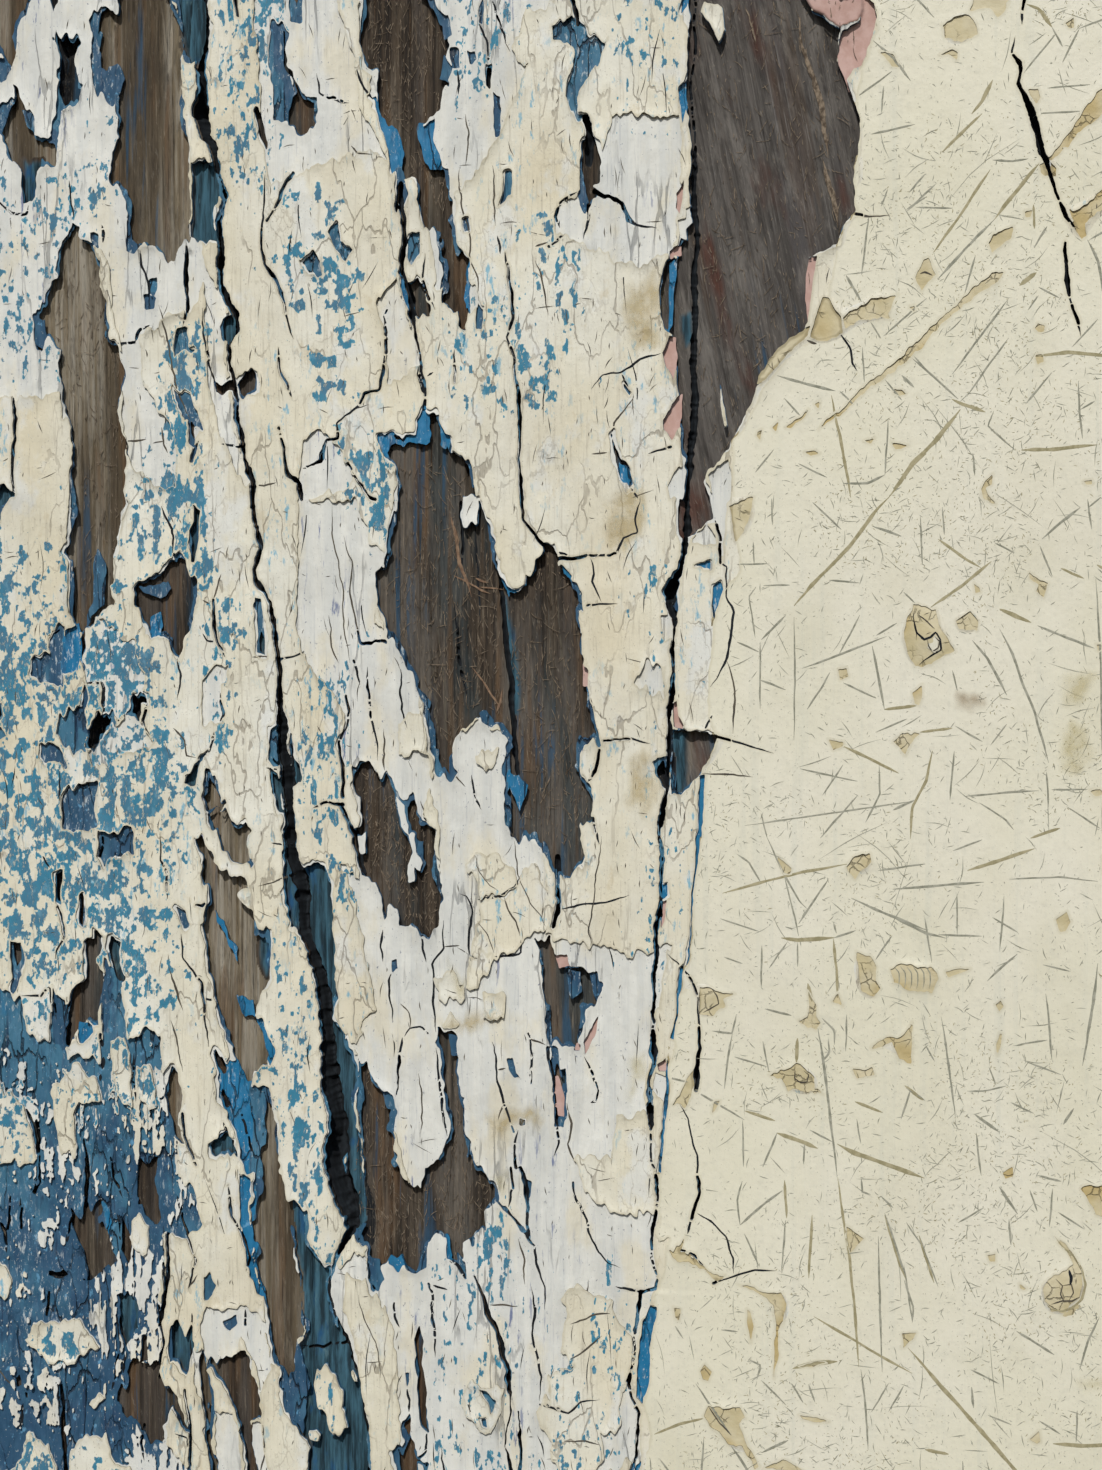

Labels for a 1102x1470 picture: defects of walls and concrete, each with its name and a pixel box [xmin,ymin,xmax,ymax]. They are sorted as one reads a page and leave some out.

crack [0,68,118,295]
peeling [0,0,257,866]
peeling [235,0,915,618]
peeling [757,272,1004,439]
peeling [915,258,935,290]
peeling [989,211,1033,252]
crack [0,546,61,638]
crack [87,623,114,712]
crack [105,0,671,1470]
peeling [904,604,978,667]
peeling [0,404,733,1470]
peeling [1020,1238,1087,1317]